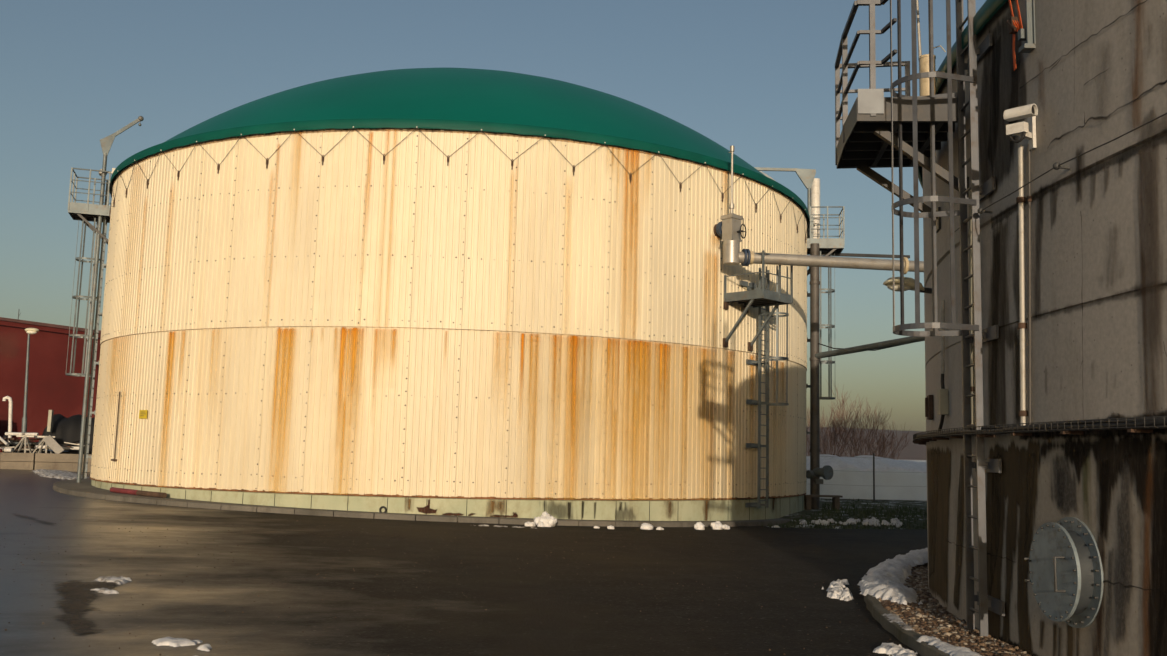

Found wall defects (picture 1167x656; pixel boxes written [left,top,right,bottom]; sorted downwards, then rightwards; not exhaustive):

leakage [980,14,1026,197]
rust [166,332,185,432]
rust [274,327,293,437]
rust [340,327,358,431]
rust [521,333,538,375]
rust [554,336,586,437]
rust [607,339,667,435]
leakage [986,131,1167,656]
leakage [927,447,964,610]